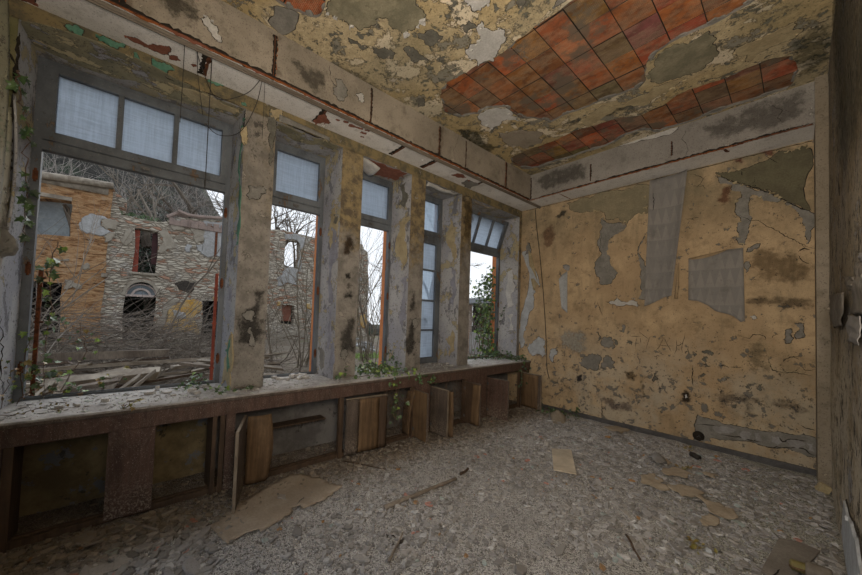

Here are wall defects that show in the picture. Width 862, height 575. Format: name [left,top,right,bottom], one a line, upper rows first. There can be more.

peeling [0,0,19,270]
peeling [124,35,211,76]
peeling [200,15,222,43]
peeling [168,82,267,245]
peeling [280,0,443,63]
flaking render [440,0,753,130]
flaking render [505,56,799,199]
flaking render [715,143,814,273]
crack [0,317,8,386]